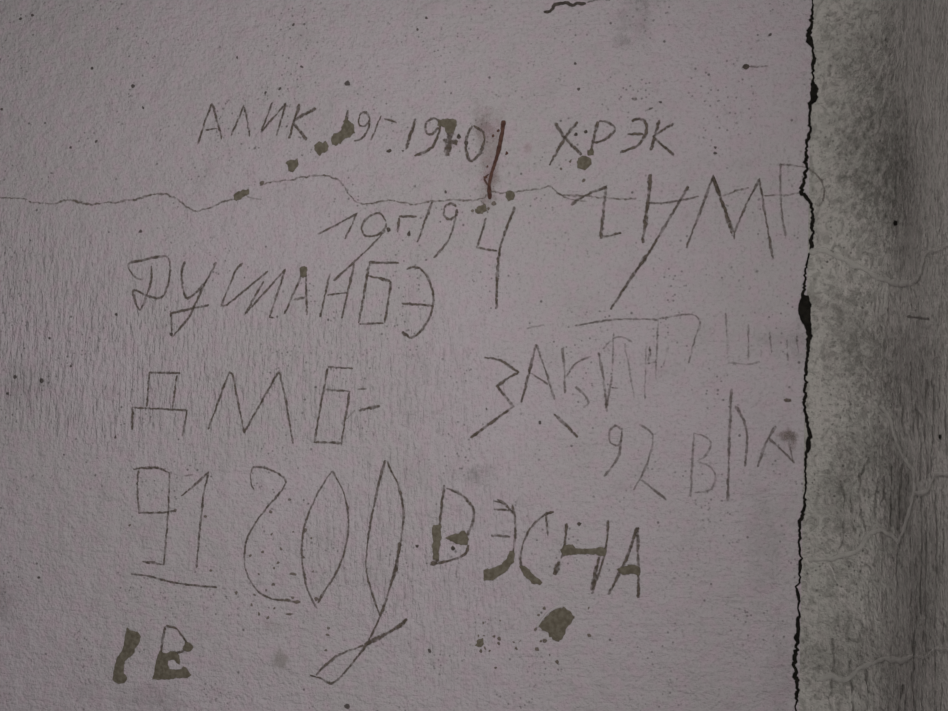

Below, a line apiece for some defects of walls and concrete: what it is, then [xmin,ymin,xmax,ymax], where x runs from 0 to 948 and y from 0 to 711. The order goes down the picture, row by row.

crack [60,193,232,211]
crack [792,0,818,711]